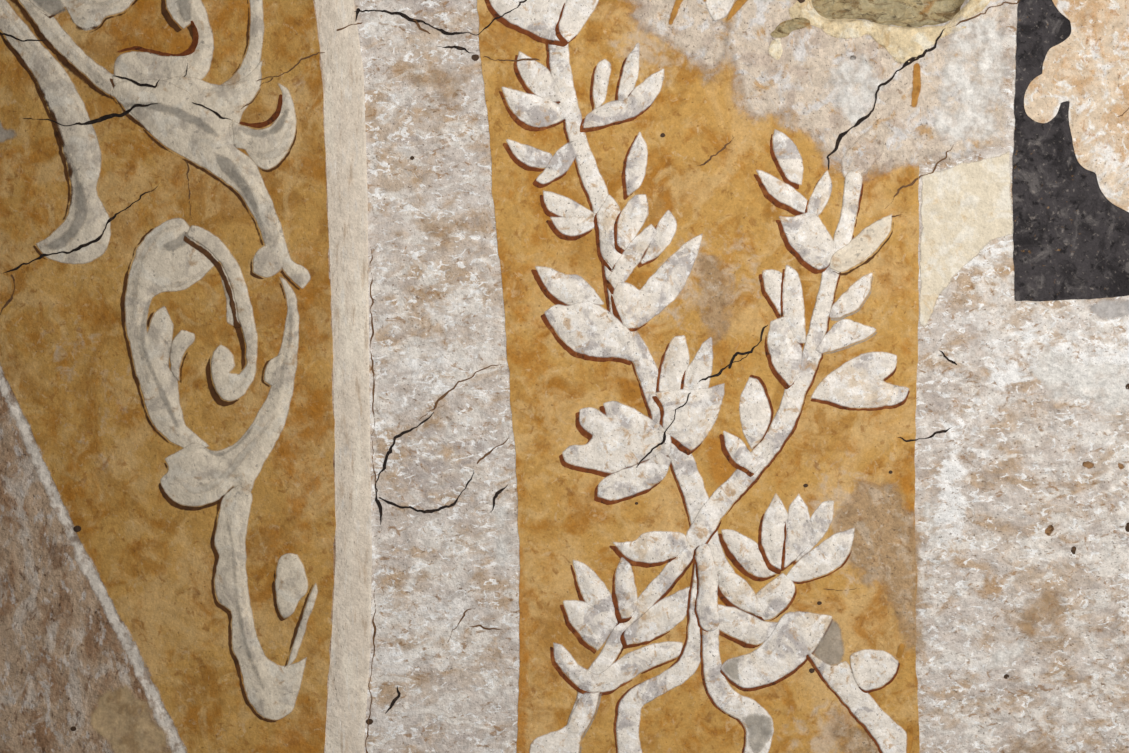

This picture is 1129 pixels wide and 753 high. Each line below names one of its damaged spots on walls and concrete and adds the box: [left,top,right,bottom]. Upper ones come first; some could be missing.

crack [0,32,46,42]
crack [23,0,539,126]
peeling [632,0,1012,177]
crack [827,0,1020,170]
crack [0,186,158,315]
crack [184,158,192,215]
crack [370,249,508,525]
crack [636,325,768,468]